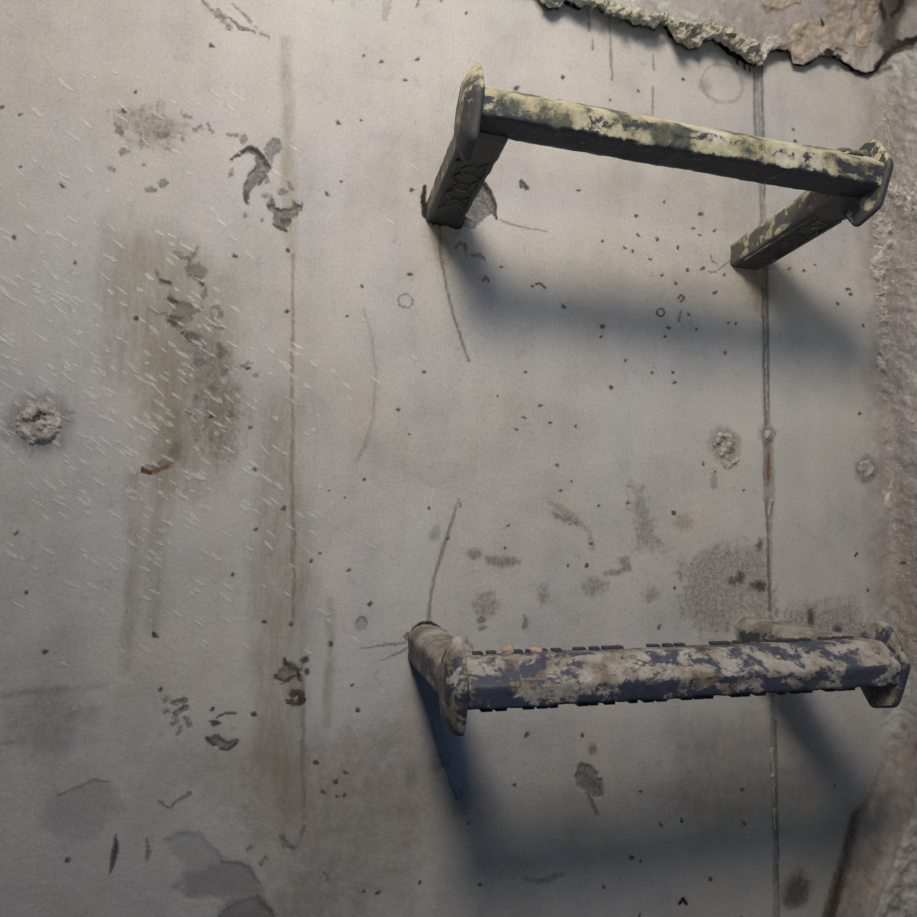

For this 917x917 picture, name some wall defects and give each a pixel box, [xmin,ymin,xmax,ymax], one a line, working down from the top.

peeling [761,0,907,62]
spalling [463,181,497,229]